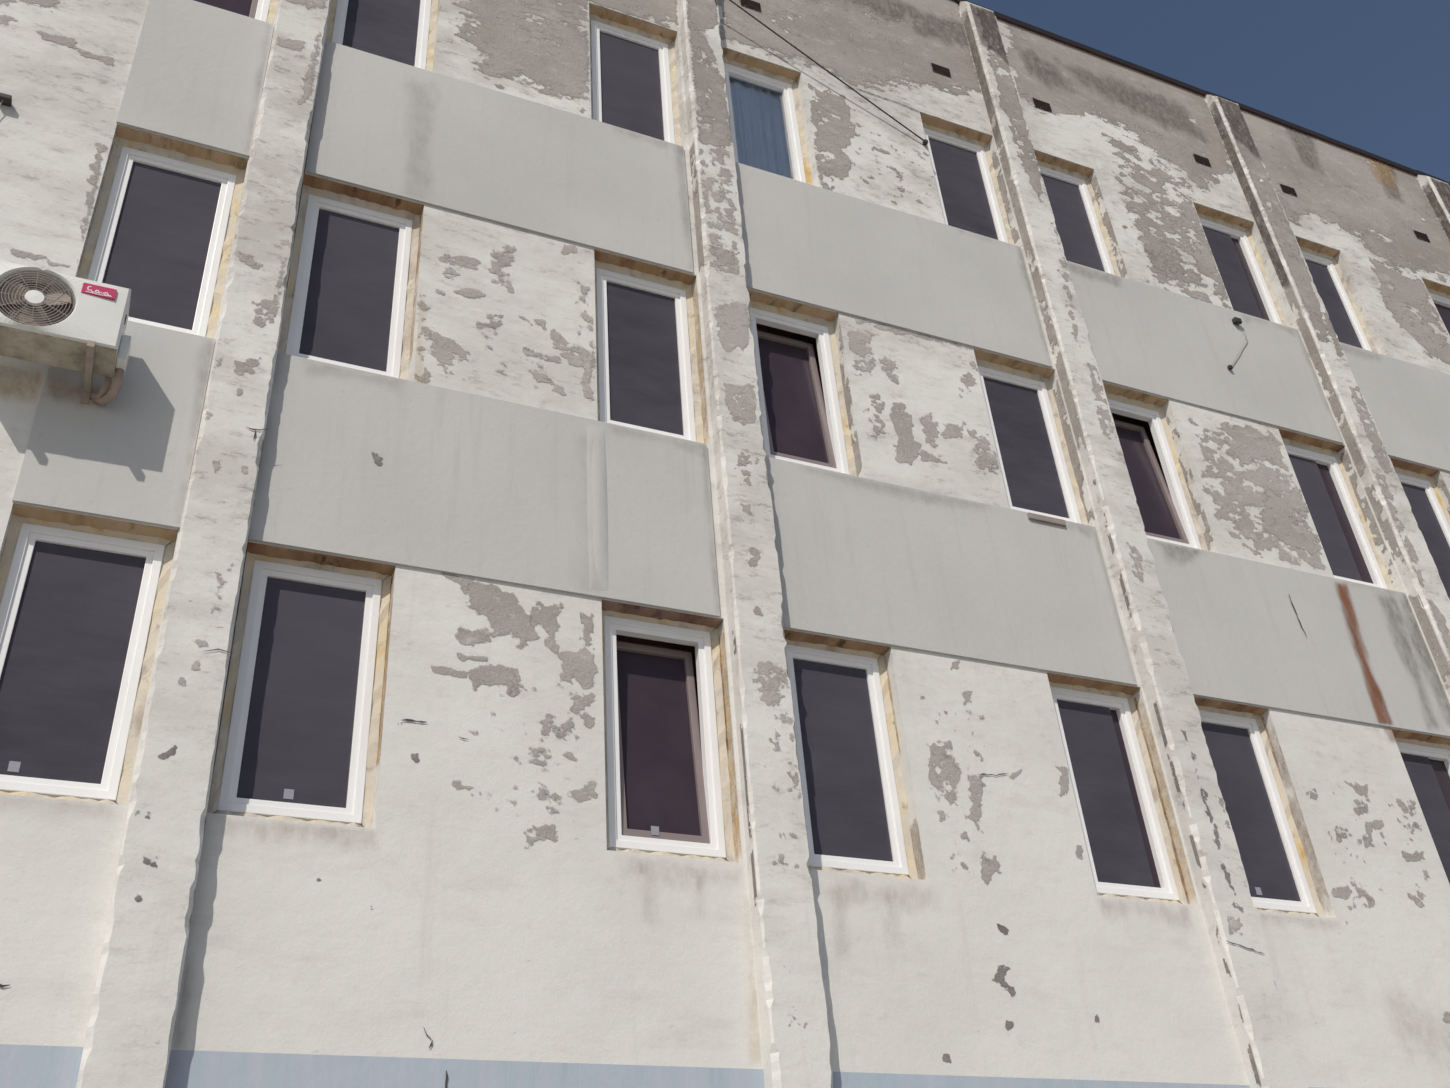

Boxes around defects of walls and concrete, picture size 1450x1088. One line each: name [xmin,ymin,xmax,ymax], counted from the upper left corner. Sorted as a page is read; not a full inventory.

peeling [36,31,115,66]
peeling [252,33,321,327]
peeling [214,357,261,396]
peeling [415,245,516,384]
peeling [451,0,1450,682]
peeling [441,572,598,848]
spalling [740,724,757,906]
peeling [753,661,801,798]
peeling [928,691,1001,885]
peeling [1332,881,1381,923]
corrosion [1338,584,1391,724]
peeling [1306,781,1429,908]